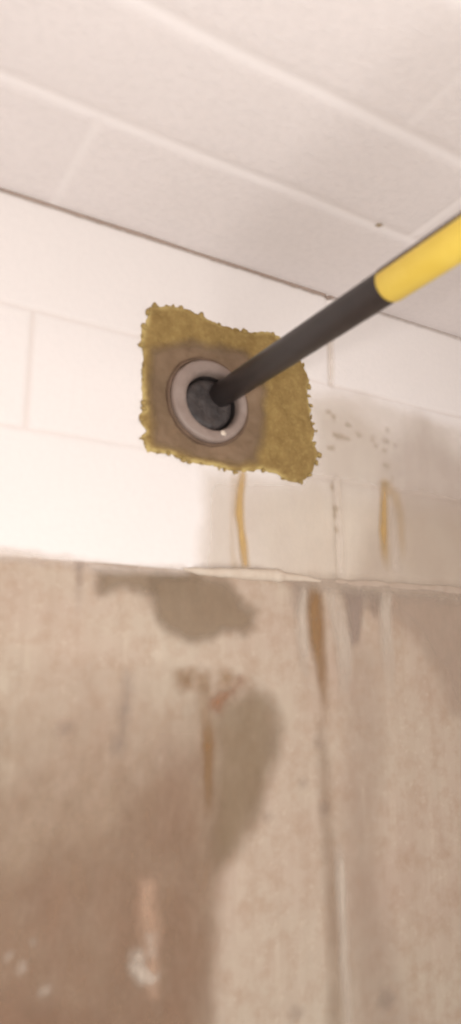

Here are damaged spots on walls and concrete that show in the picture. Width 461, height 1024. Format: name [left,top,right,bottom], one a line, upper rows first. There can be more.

corrosion [236,474,247,565]
damp [101,572,252,638]
corrosion [310,583,324,670]